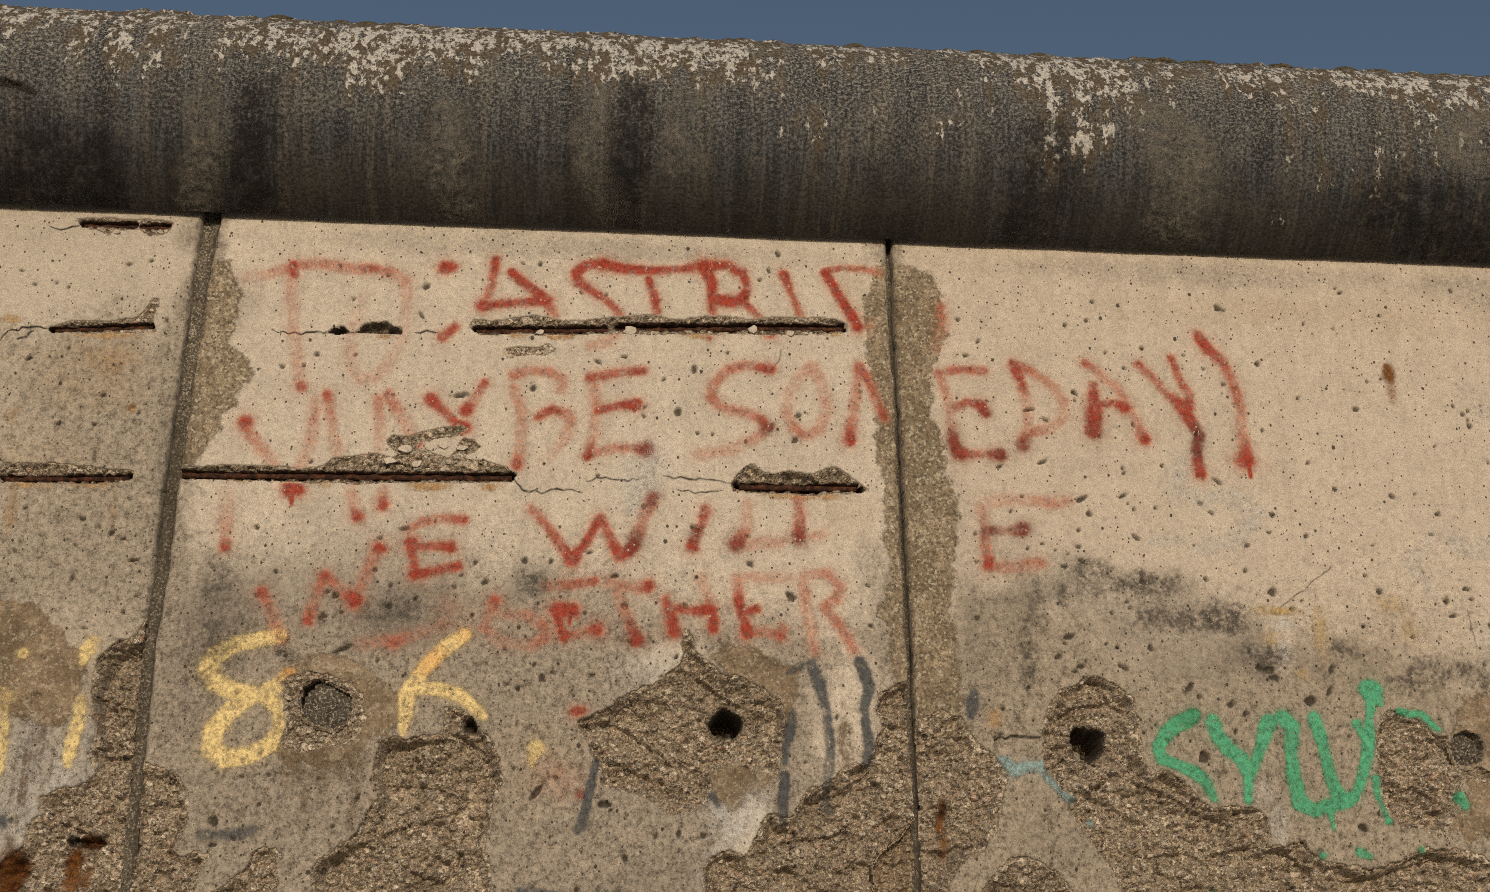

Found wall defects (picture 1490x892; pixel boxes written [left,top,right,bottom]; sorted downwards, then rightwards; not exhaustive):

water stain [178,82,282,213]
water stain [574,82,705,229]
water stain [1132,102,1221,241]
crack [1,326,47,339]
corrosion [48,299,159,360]
corrosion [469,315,847,340]
corrosion [180,453,517,491]
corrosion [731,464,869,500]
spalling [703,262,1008,892]
spalling [0,600,283,892]
spalling [577,629,800,816]
spalling [1041,676,1490,892]